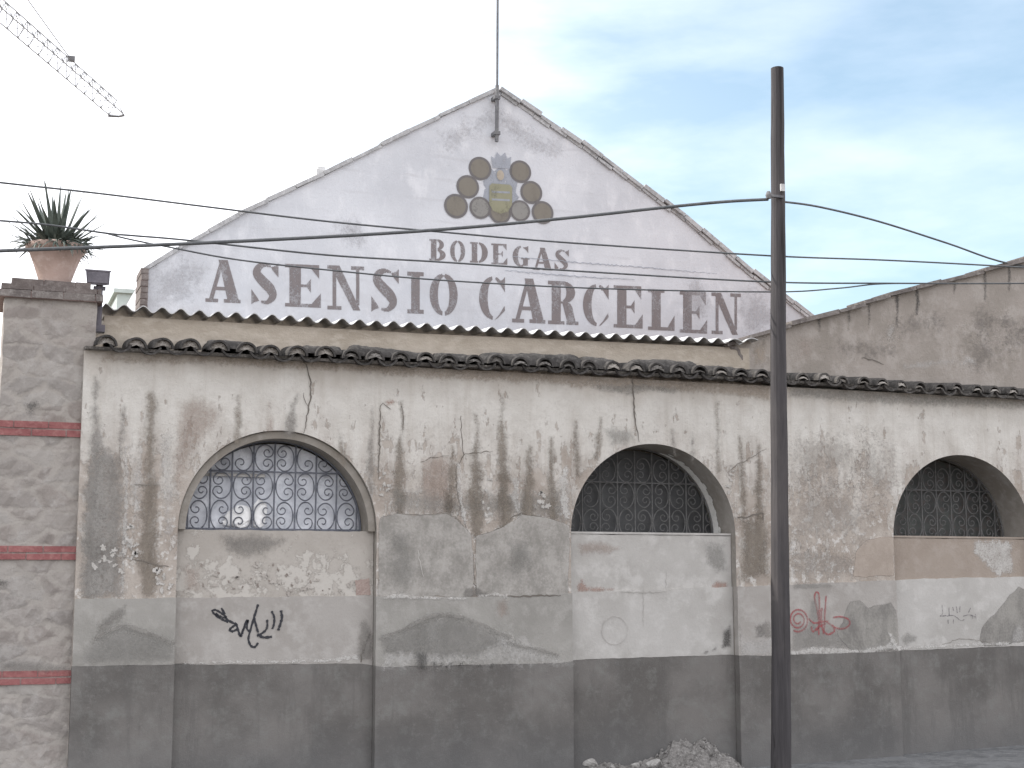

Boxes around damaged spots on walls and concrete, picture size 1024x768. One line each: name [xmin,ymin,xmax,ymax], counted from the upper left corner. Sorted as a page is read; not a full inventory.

leakage [80,409,121,597]
peeling [91,447,139,590]
leakage [139,395,159,594]
peeling [200,560,371,598]
crack [303,362,312,431]
crack [378,403,404,477]
crack [383,417,556,586]
leakage [468,444,483,536]
leakage [497,421,533,527]
crack [631,376,639,440]
leakage [740,456,766,577]
flaking render [974,539,1013,576]